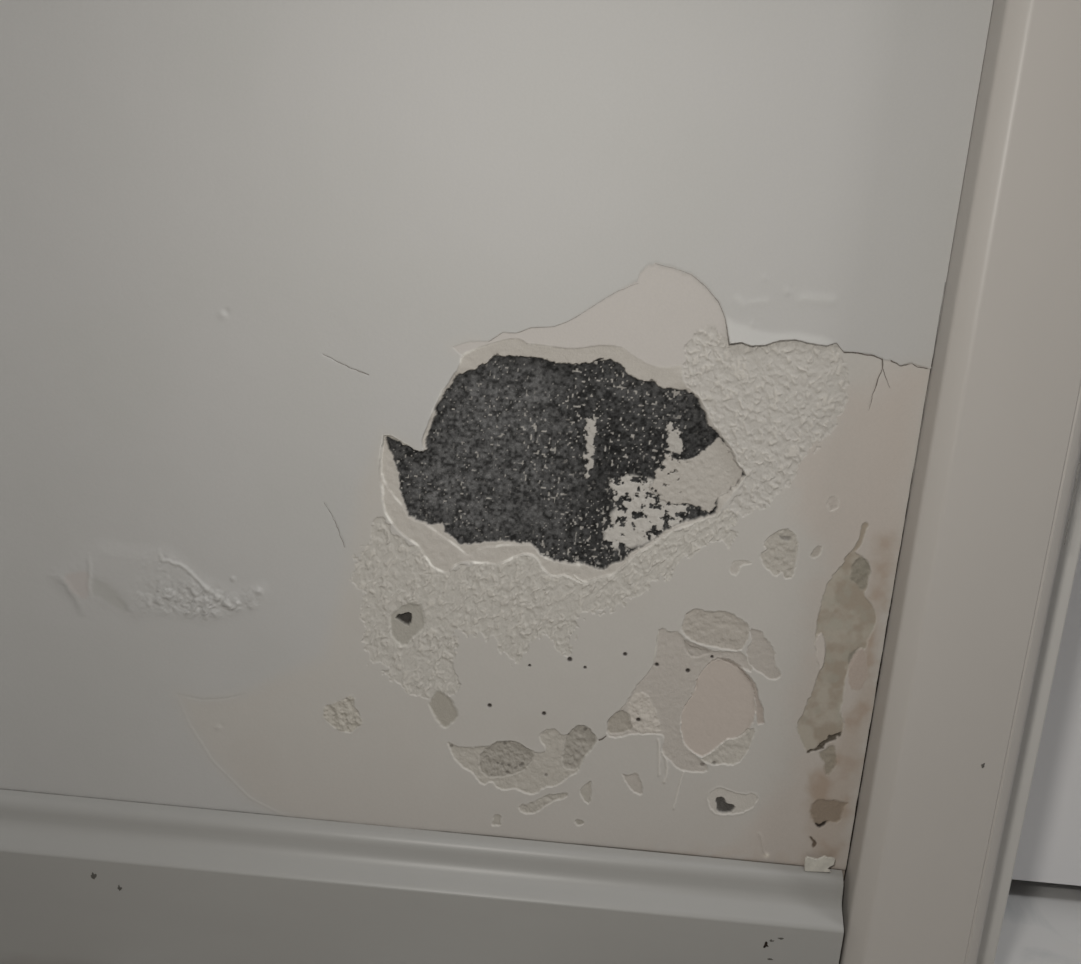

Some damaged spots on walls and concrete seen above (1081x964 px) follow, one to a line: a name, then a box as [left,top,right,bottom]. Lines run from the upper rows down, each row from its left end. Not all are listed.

spalling [391,603,425,645]
spalling [429,691,458,727]
spalling [380,338,746,582]
spalling [449,609,781,815]
crack [655,263,946,881]
damp [703,354,933,887]
peeling [727,315,927,774]